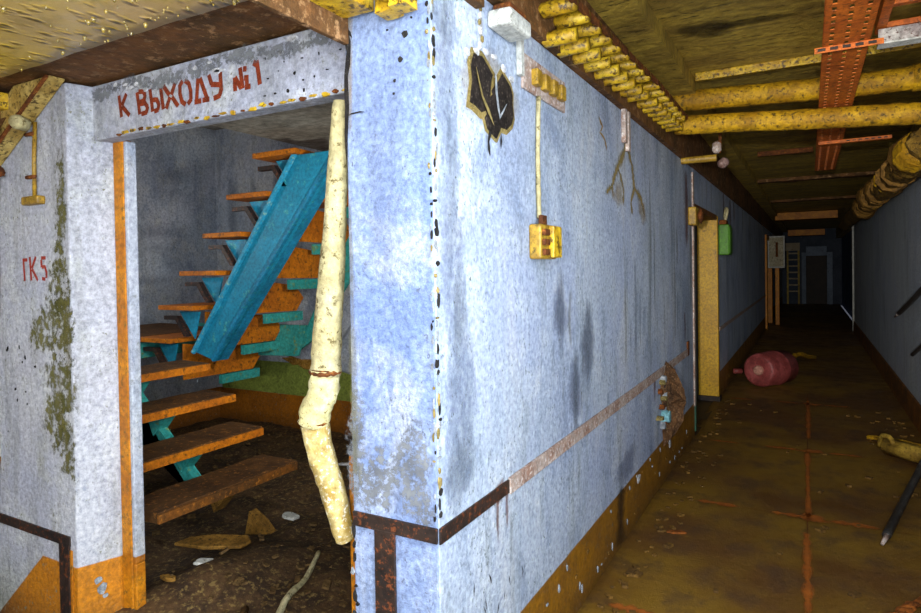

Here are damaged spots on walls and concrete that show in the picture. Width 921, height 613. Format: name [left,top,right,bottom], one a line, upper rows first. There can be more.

water stain [30,154,77,484]